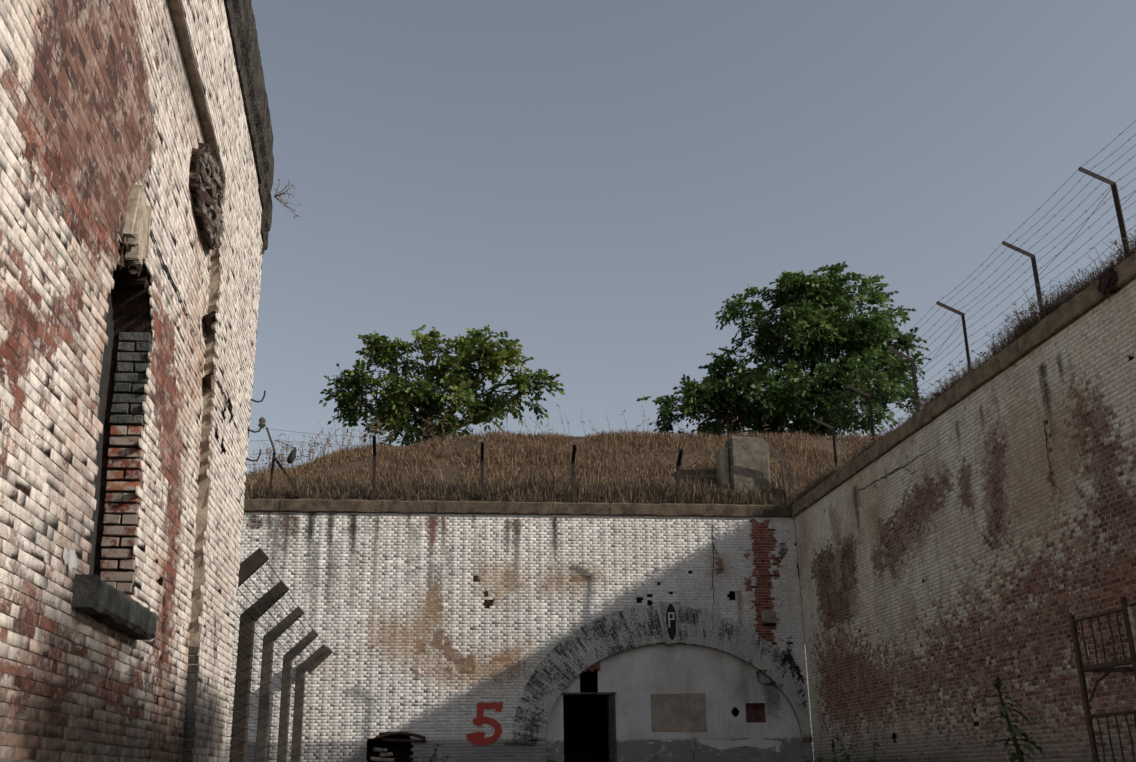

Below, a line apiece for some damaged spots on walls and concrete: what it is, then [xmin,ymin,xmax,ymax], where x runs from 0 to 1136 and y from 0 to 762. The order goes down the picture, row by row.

peeling [0,0,184,738]
water stain [266,512,336,598]
water stain [349,514,379,559]
water stain [506,519,521,546]
peeling [740,519,798,656]
peeling [797,373,1136,762]